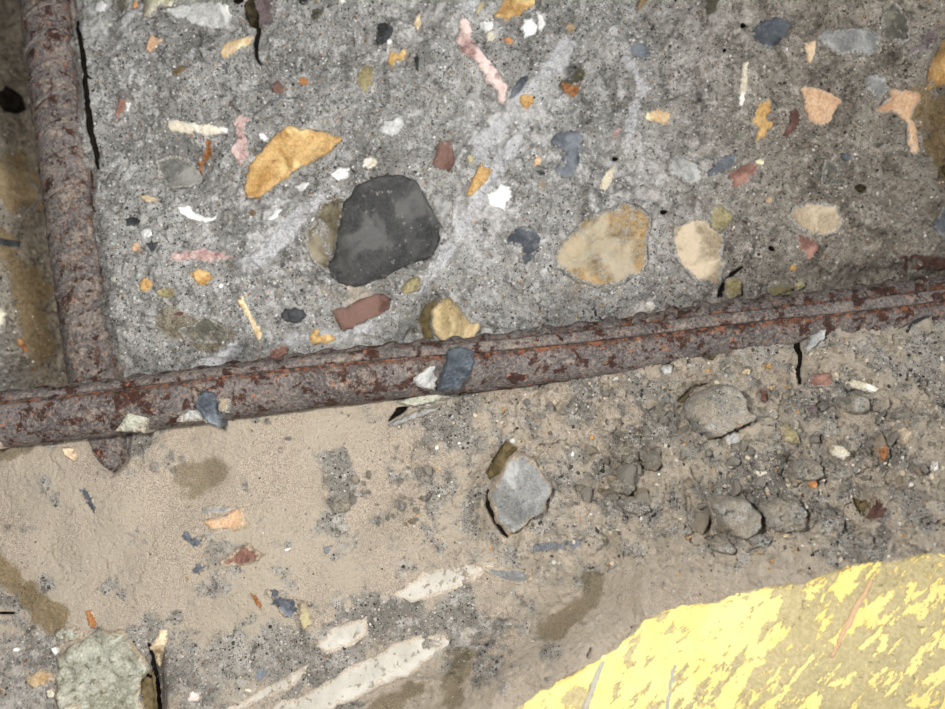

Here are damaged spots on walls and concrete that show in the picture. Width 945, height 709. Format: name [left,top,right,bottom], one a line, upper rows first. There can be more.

crack [76,20,99,169]
crack [254,28,262,65]
spalling [0,0,945,384]
spalling [0,203,945,709]